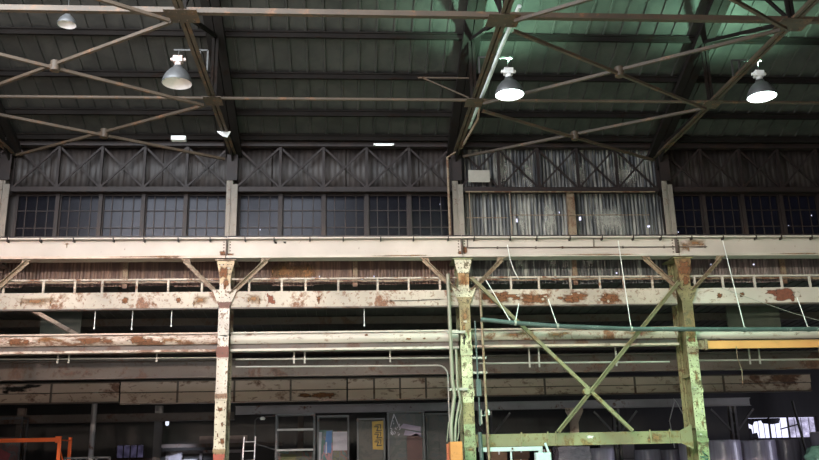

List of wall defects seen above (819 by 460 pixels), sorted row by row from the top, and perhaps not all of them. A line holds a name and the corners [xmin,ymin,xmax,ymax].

rust [248,293,275,304]
rust [765,288,800,302]